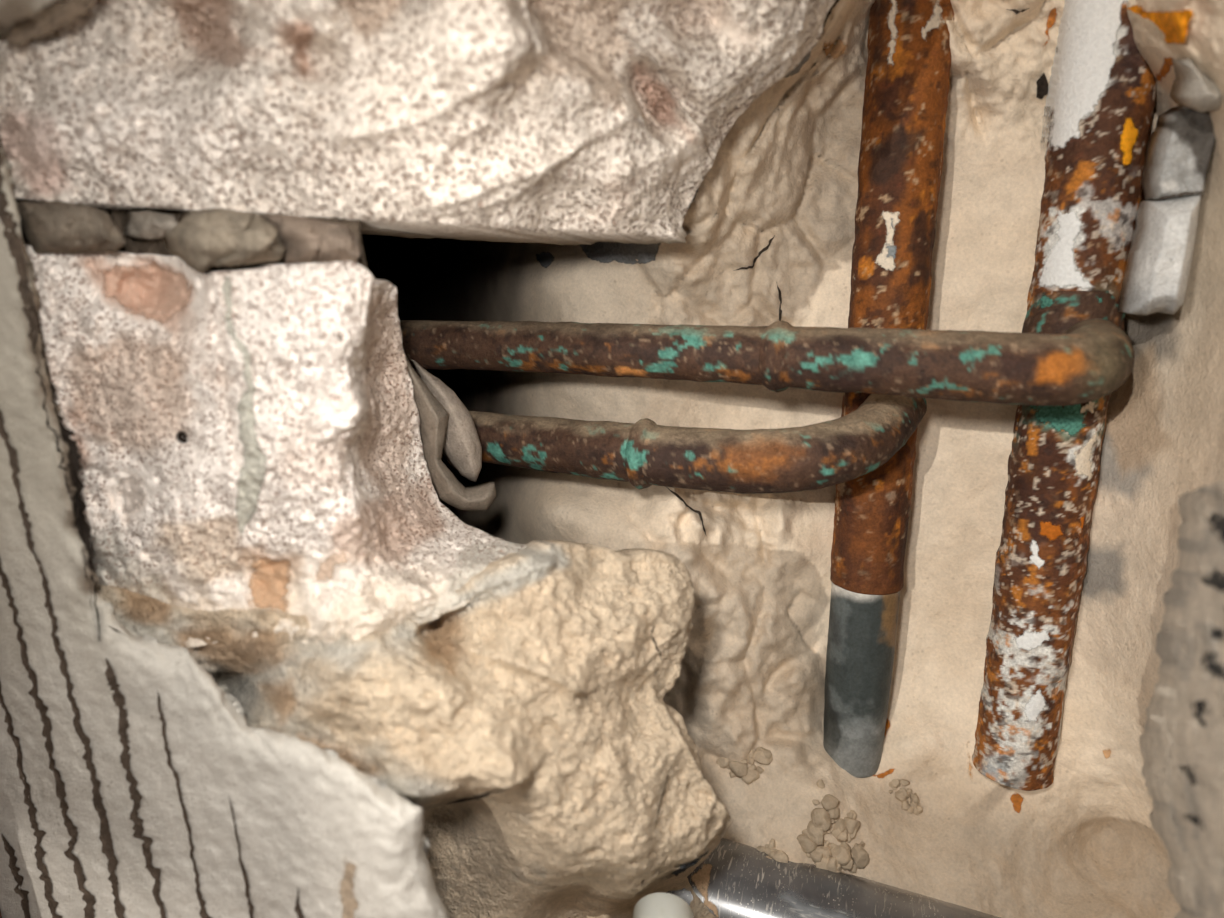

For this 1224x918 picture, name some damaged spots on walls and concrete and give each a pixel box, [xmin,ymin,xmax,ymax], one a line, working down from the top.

crack [823,0,839,28]
corrosion [1045,8,1057,46]
corrosion [1127,5,1193,81]
spalling [0,0,836,245]
spalling [25,245,733,918]